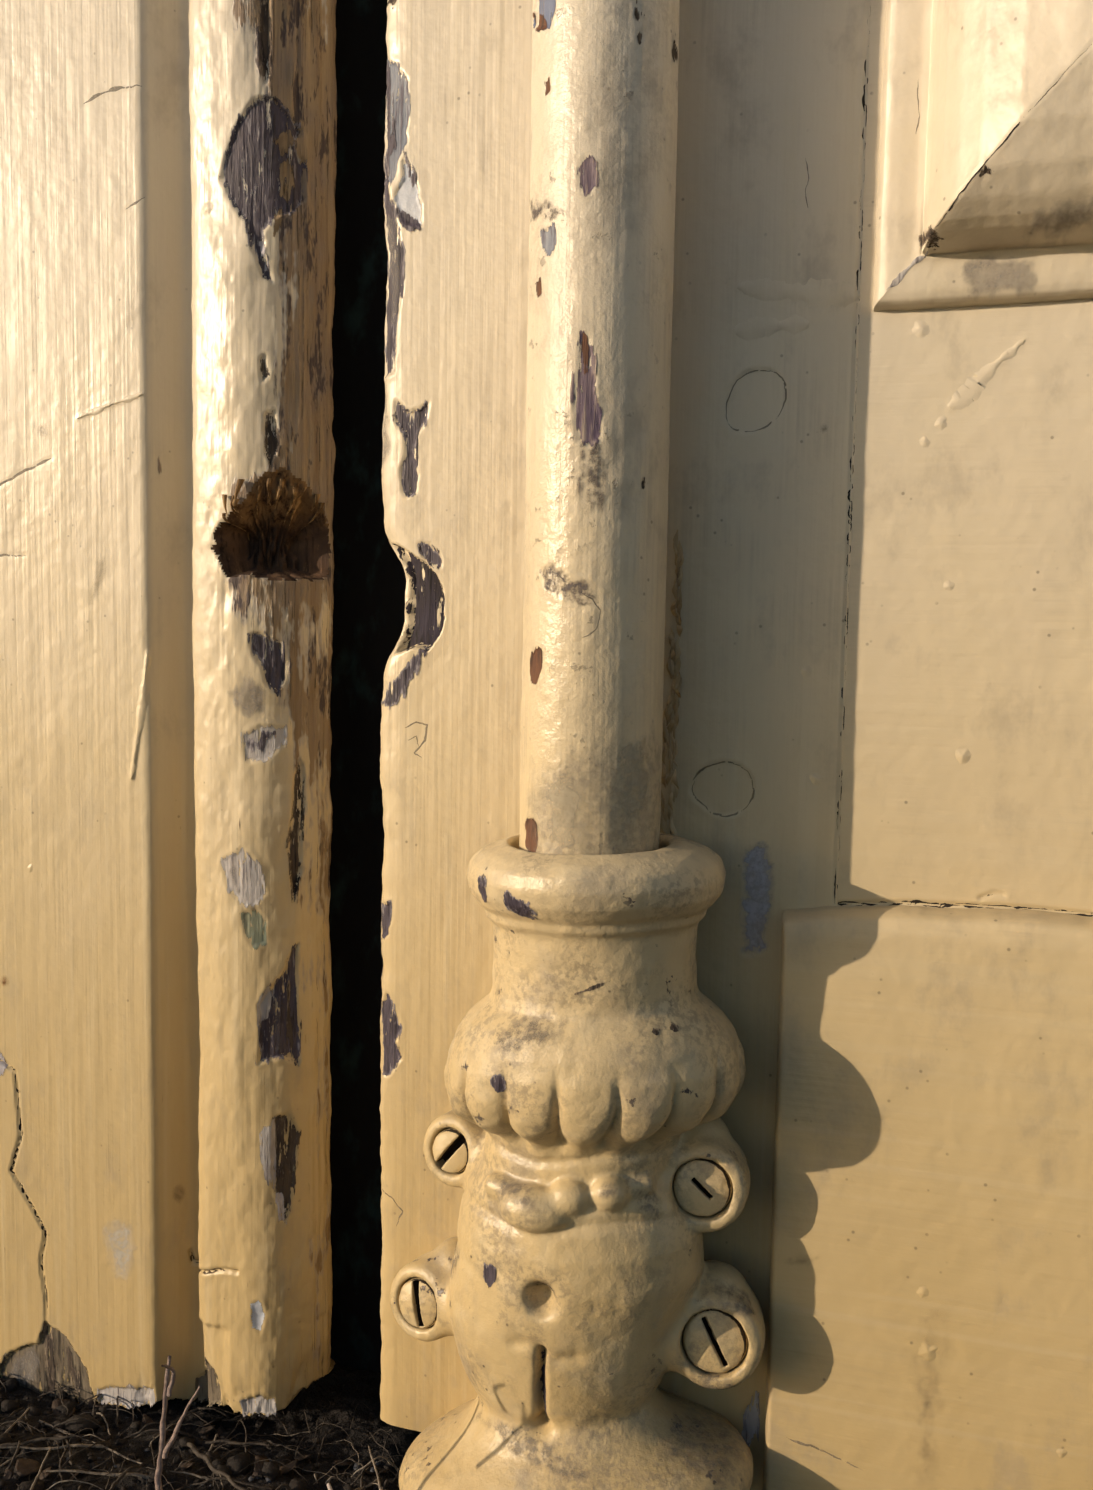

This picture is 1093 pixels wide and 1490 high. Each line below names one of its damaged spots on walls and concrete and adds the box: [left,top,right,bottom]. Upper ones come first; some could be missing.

peeling [219,94,308,280]
peeling [384,58,422,378]
peeling [570,330,603,507]
peeling [418,541,442,569]
peeling [234,631,288,763]
peeling [381,645,432,709]
peeling [255,944,302,1066]
crack [0,1053,48,1308]
peeling [259,1115,301,1224]